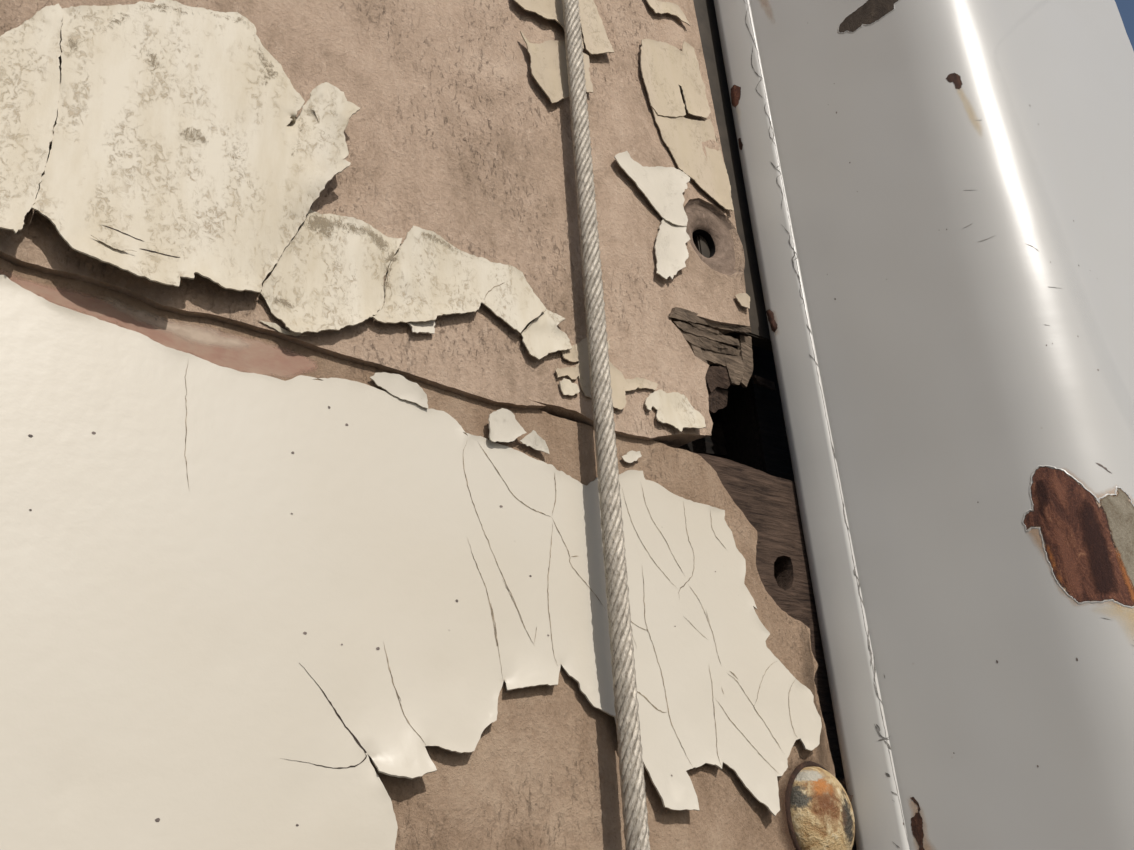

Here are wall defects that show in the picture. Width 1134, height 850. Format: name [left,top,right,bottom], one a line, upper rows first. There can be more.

peeling [0,0,592,398]
peeling [614,39,734,280]
corrosion [946,73,962,89]
spalling [607,307,776,432]
peeling [0,275,626,850]
crack [286,663,367,769]
crack [384,645,425,743]
crack [463,442,602,677]
crack [622,488,796,769]
peeling [618,450,822,850]
corrosion [911,797,925,850]
corrosion [1021,465,1134,609]